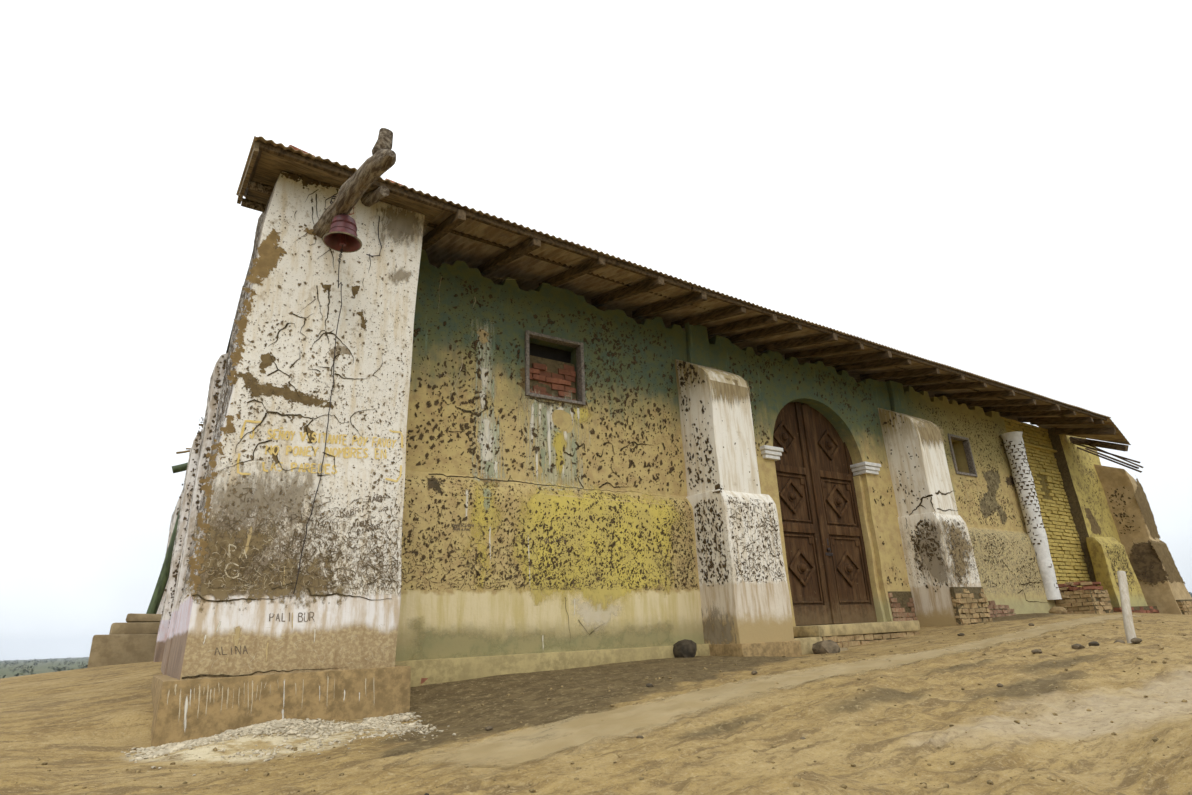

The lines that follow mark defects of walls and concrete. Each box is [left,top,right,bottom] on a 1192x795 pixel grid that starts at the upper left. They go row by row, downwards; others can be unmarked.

crack [221,188,383,477]
spalling [160,172,785,628]
damp [465,325,505,516]
damp [525,392,592,493]
crack [906,490,960,529]
damp [167,680,304,728]